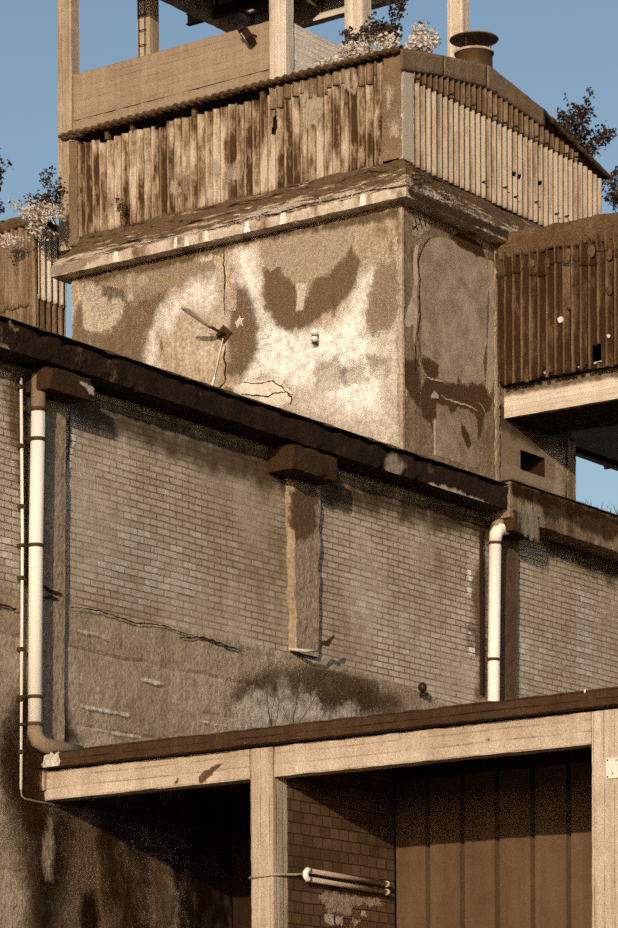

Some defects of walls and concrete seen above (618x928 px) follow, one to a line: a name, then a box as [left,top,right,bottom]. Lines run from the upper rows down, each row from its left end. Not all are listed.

crack [220,256,228,314]
flaking render [396,214,494,394]
crack [219,345,227,388]
leakage [73,188,576,497]
leakage [504,369,618,395]
crack [64,404,72,467]
flaking render [434,406,480,468]
leakage [324,480,489,539]
crack [43,584,245,653]
leakage [232,665,399,730]
leakage [0,691,114,928]
peeling [319,891,381,926]